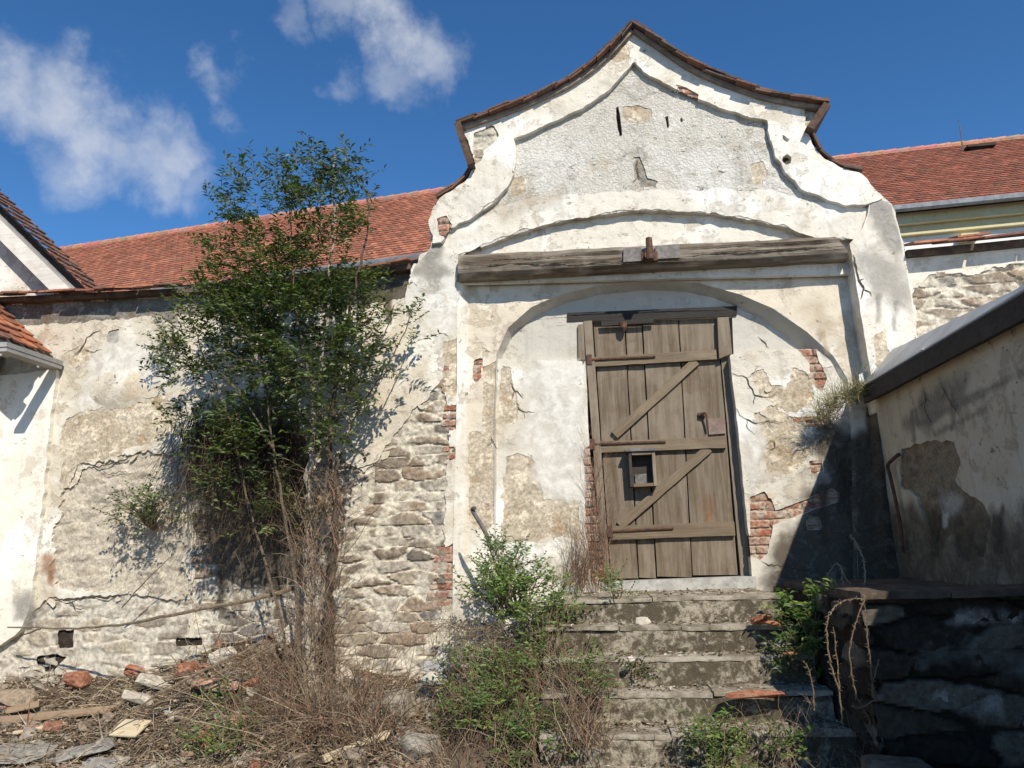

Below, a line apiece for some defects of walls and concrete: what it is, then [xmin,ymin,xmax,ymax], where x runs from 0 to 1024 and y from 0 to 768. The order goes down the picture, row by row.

flaking render [473,127,499,164]
flaking render [633,157,658,188]
flaking render [437,217,452,238]
crack [853,255,872,298]
flaking render [912,263,1024,337]
crack [733,338,783,450]
flaking render [749,348,827,475]
crack [69,450,143,484]
flaking render [0,339,606,682]
flaking render [748,489,839,559]
damp [766,408,1024,593]
crack [29,594,123,619]